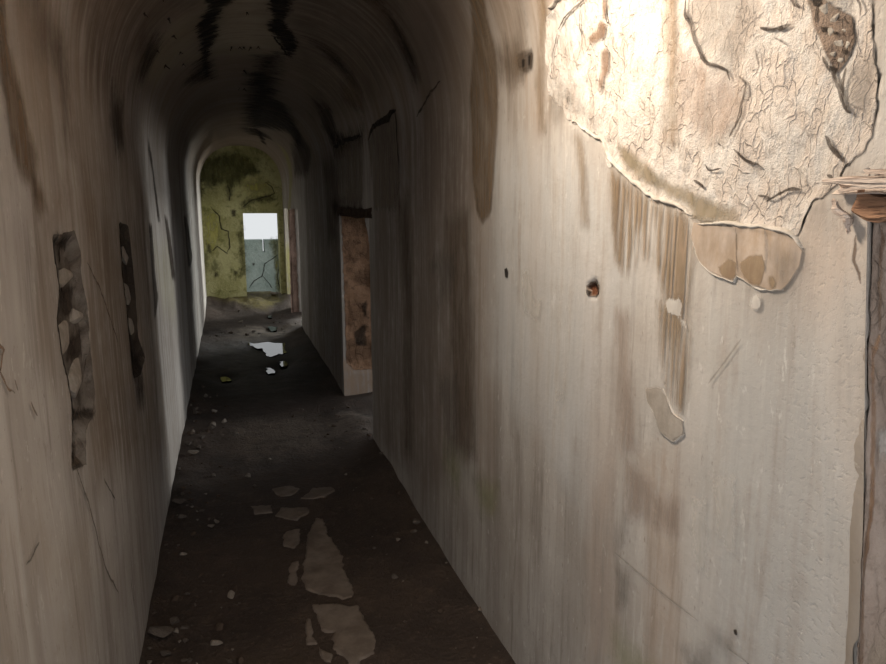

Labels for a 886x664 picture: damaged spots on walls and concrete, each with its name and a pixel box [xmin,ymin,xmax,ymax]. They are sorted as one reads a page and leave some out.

spalling [53,231,95,470]
spalling [119,222,145,400]
crack [211,182,275,253]
crack [249,256,279,288]
spalling [341,216,372,370]
water stain [470,0,497,221]
spalling [517,51,532,72]
peeling [646,388,685,443]
spalling [545,0,877,309]
spalling [852,222,886,664]